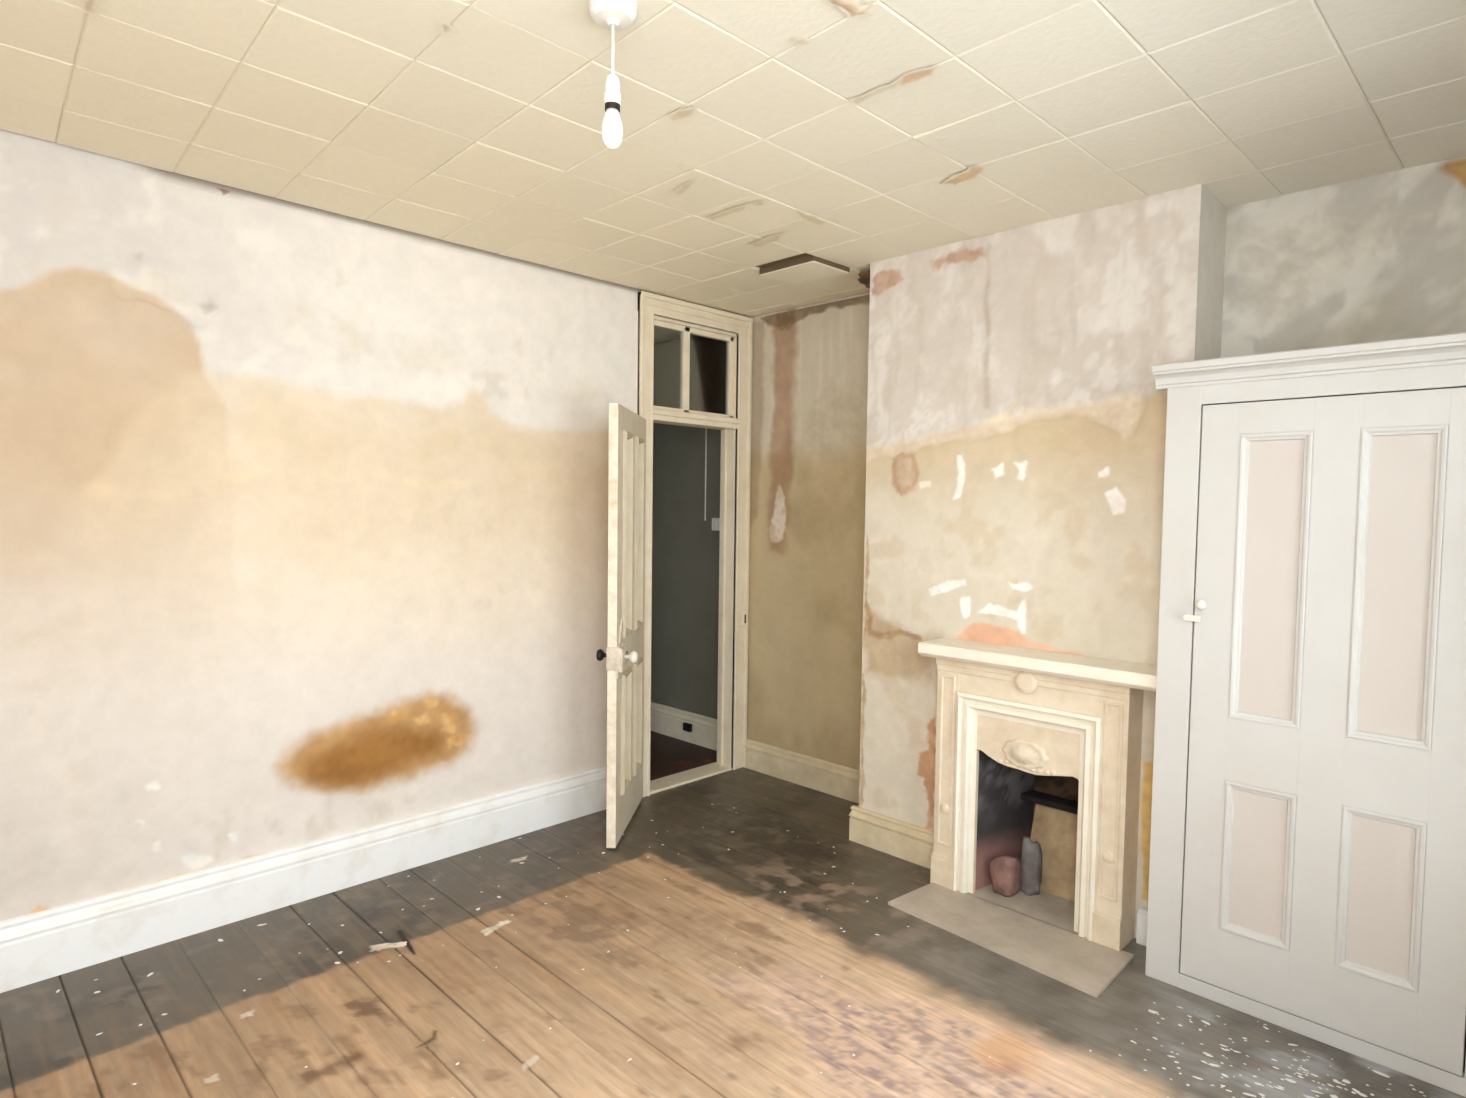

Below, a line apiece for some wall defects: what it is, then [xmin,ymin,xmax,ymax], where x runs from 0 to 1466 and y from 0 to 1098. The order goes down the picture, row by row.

peeling [825,0,875,19]
peeling [849,65,941,106]
peeling [942,165,986,186]
flaking render [927,243,988,275]
flaking render [858,266,906,299]
flaking render [927,578,1099,658]
peeling [915,714,937,830]